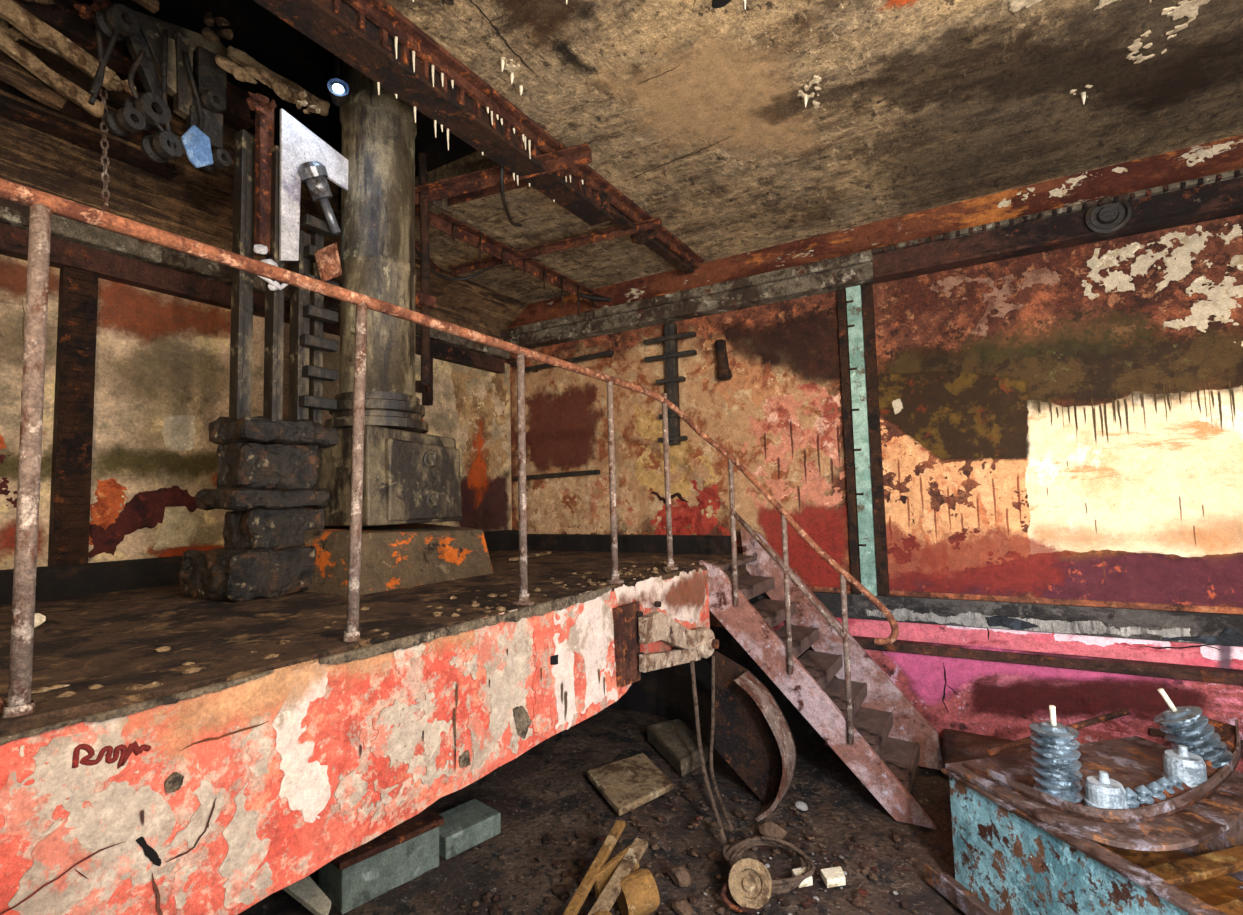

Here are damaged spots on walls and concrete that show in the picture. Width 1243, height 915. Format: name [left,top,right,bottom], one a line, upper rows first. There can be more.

water stain [496,0,610,95]
peeling [1186,141,1234,167]
peeling [1081,223,1243,333]
water stain [878,330,1243,460]
peeling [0,568,707,915]
crack [0,842,123,915]
crack [152,798,217,915]